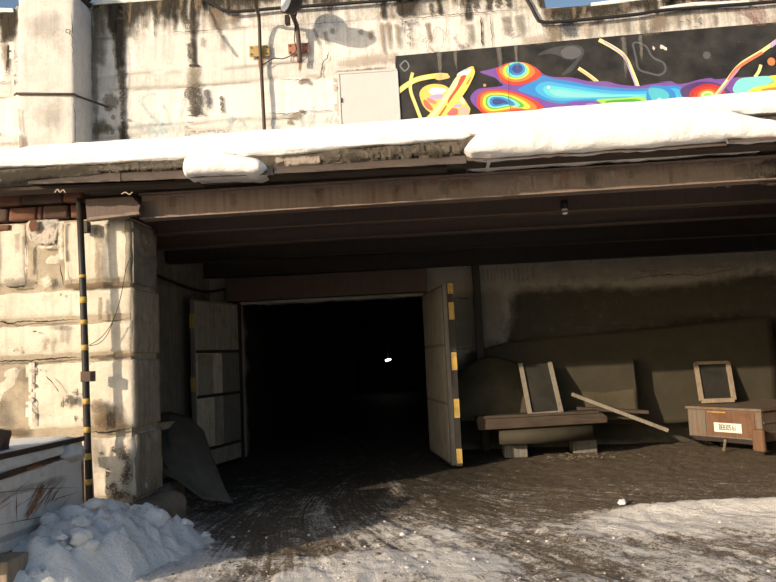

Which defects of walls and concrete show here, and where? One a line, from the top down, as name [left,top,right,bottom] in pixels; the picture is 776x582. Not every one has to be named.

water stain [0,12,18,71]
water stain [91,0,281,140]
water stain [338,0,443,72]
water stain [454,0,512,40]
water stain [504,0,722,43]
spalling [24,219,64,282]